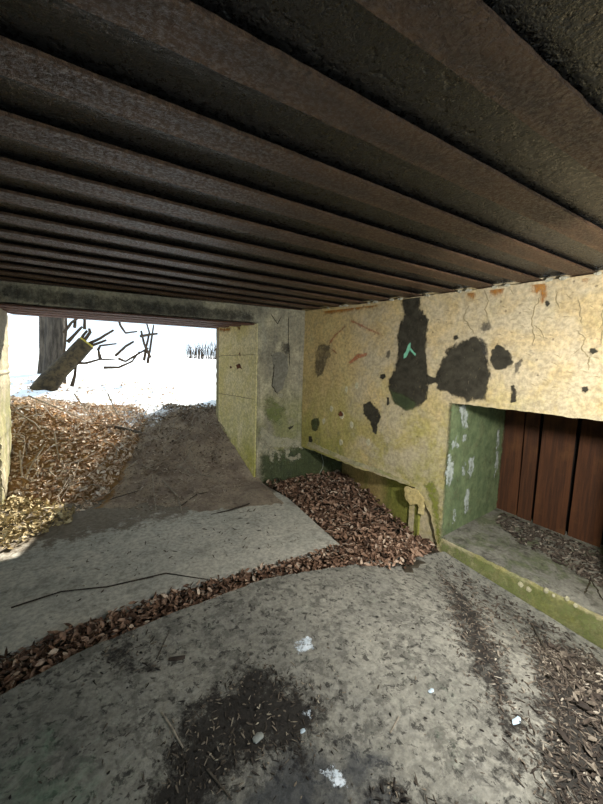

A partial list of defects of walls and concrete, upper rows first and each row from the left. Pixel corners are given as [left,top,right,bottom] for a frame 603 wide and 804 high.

crack [463,290,489,333]
rust [532,283,546,303]
crack [529,292,560,346]
crack [575,300,603,370]